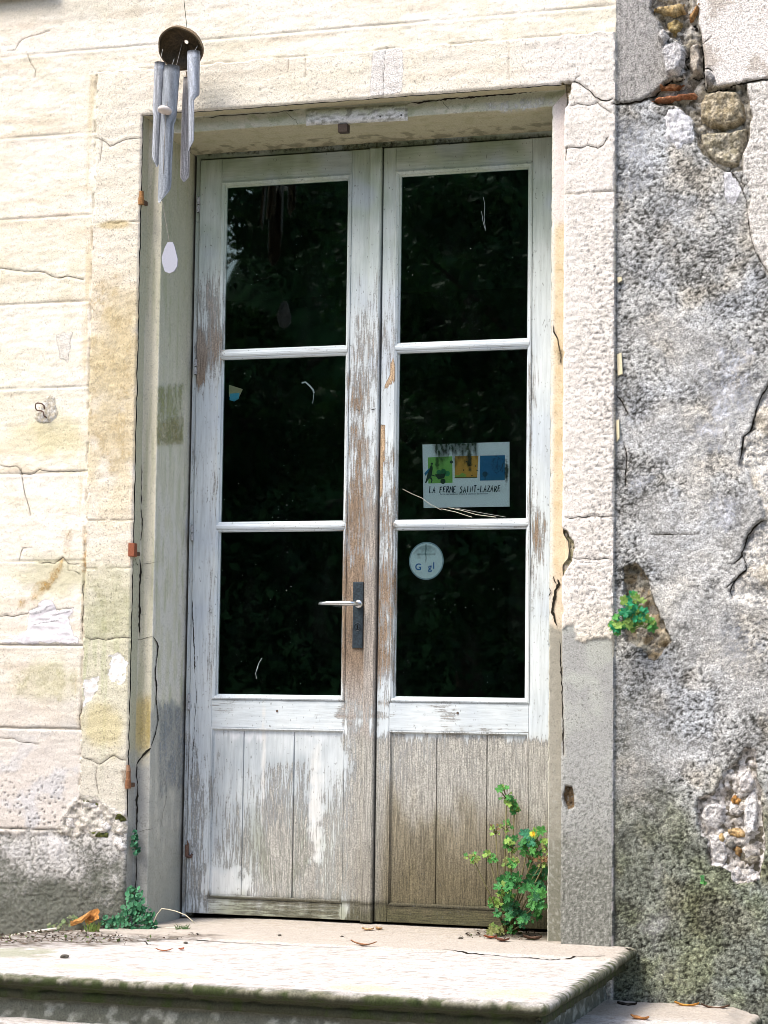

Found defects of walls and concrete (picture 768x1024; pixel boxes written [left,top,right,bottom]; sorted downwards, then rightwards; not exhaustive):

spalling [650,0,752,204]
water stain [157,385,183,443]
crack [739,386,768,463]
crack [727,521,763,595]
peeling [2,599,79,645]
spalling [623,563,670,661]
crack [6,469,197,894]
peeling [55,795,128,851]
spalling [696,747,766,884]
crack [447,949,576,960]